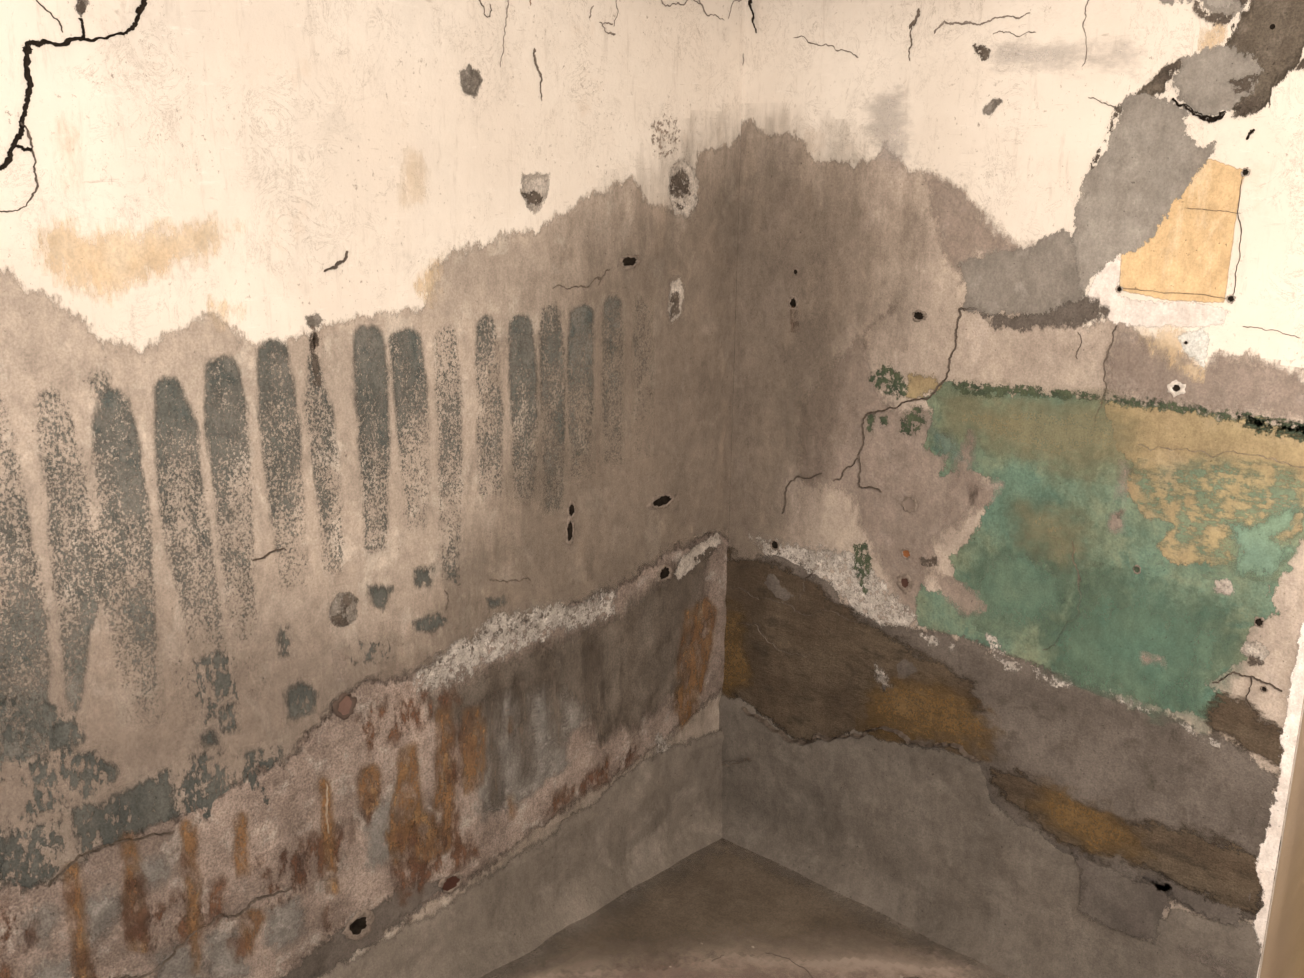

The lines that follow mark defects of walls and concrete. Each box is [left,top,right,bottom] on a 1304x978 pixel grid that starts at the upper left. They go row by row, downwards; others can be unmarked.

crack [0,0,147,213]
crack [908,8,1035,61]
crack [1172,98,1225,123]
flaking render [1135,0,1304,140]
water stain [1247,404,1304,429]
flaking render [0,296,736,978]
rust [675,597,716,726]
peeling [753,327,1304,978]
water stain [1106,538,1304,794]
rust [121,779,343,971]
rust [356,689,485,903]
water stain [989,699,1304,978]